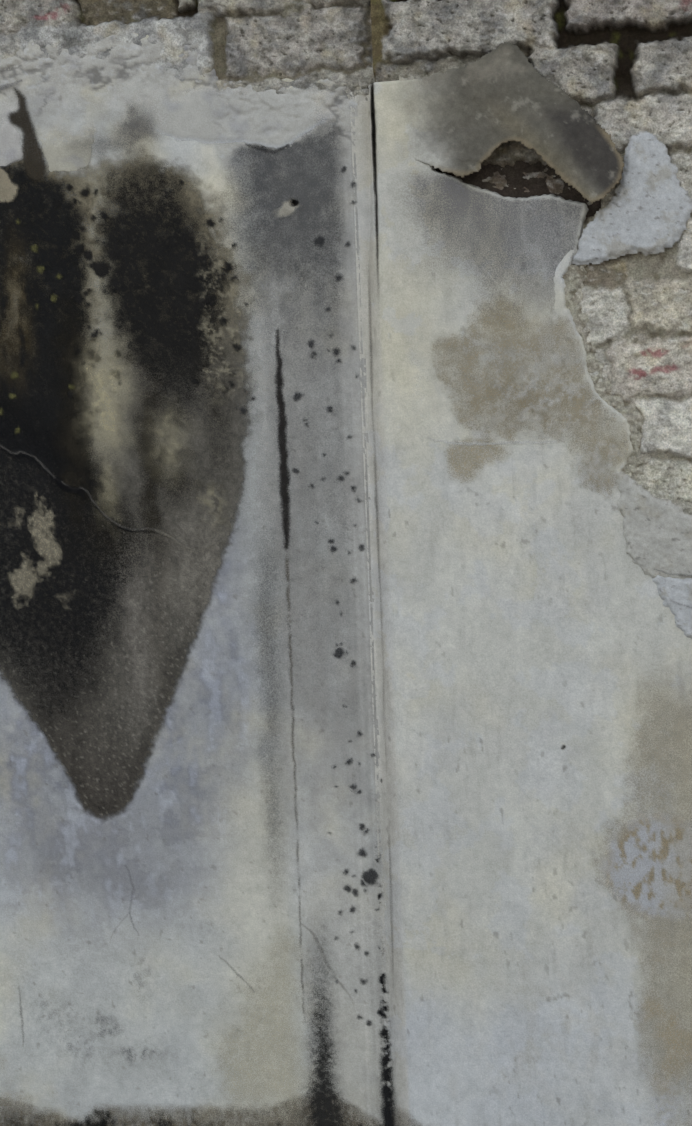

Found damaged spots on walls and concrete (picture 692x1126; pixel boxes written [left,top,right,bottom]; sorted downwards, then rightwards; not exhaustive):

leakage [0,88,355,819]
flaking render [0,0,692,639]
leakage [413,177,628,493]
leakage [0,957,416,1126]
leakage [339,849,391,913]
leakage [608,696,692,1109]